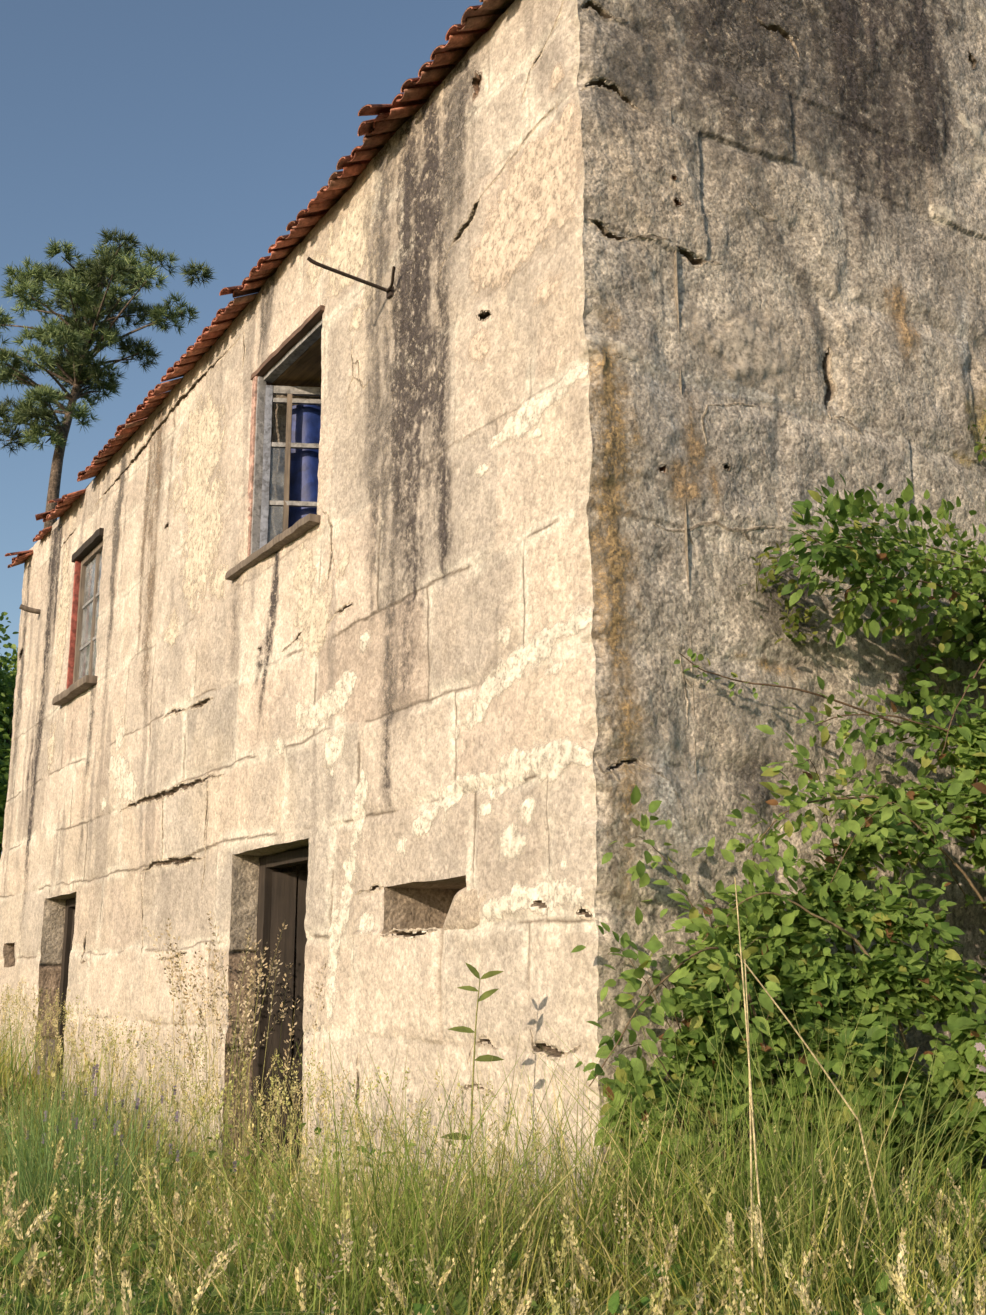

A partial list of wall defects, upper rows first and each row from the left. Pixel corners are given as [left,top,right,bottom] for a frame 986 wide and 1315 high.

crack [439,0,628,284]
crack [580,75,646,114]
leakage [607,0,955,231]
leakage [365,57,473,788]
rust [589,348,639,667]